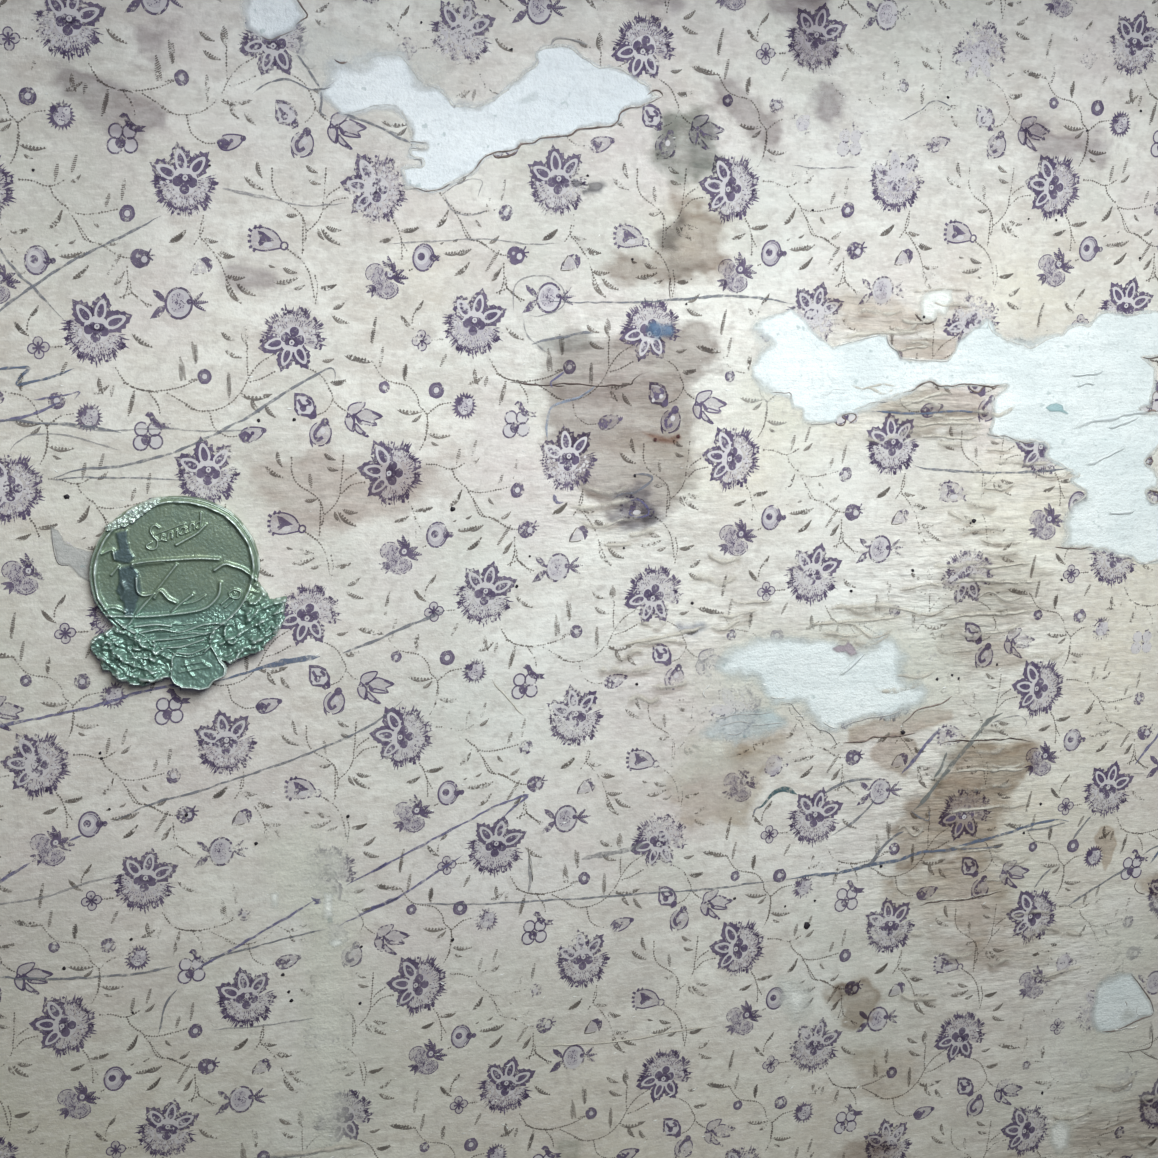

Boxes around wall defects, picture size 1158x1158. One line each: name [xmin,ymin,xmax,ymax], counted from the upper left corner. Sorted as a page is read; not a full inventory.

peeling [244,0,308,40]
peeling [320,36,663,192]
peeling [752,310,1158,564]
peeling [717,634,952,745]
peeling [1093,974,1154,1032]